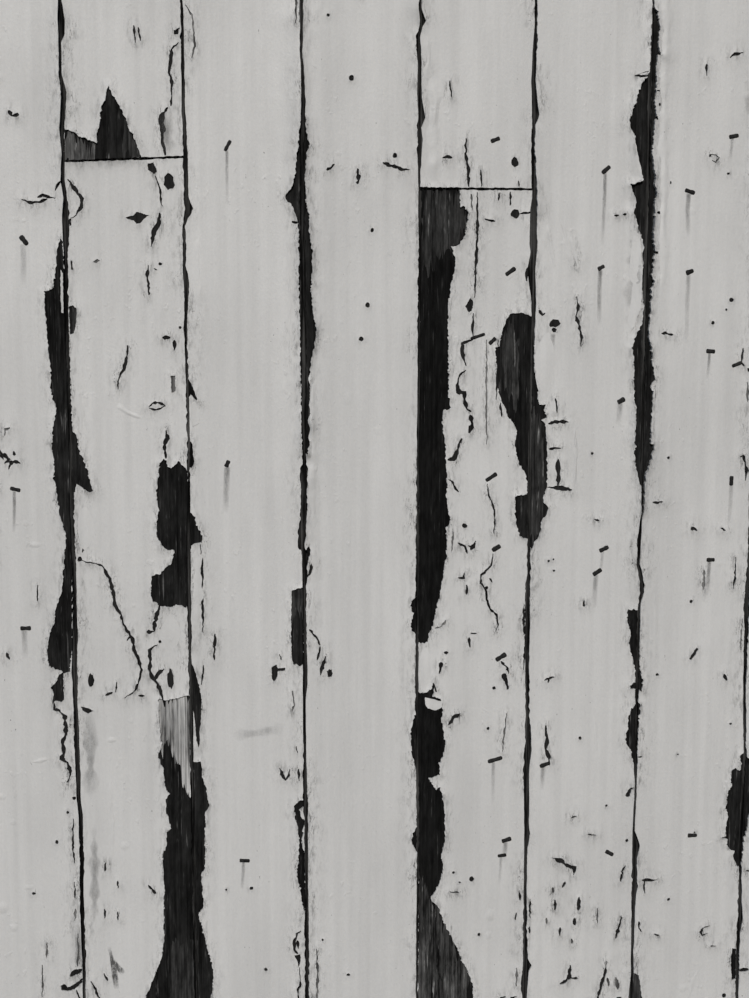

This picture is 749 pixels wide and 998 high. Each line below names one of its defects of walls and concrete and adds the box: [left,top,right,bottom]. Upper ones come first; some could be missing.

peeling [44,239,93,703]
peeling [64,87,157,174]
crack [82,549,164,699]
peeling [151,441,203,608]
peeling [285,125,316,454]
peeling [410,190,468,643]
peeling [495,313,548,549]
peeling [627,609,643,691]
peeling [628,10,661,505]
peeling [146,665,214,998]
peeling [410,683,474,998]
peeling [722,754,749,866]